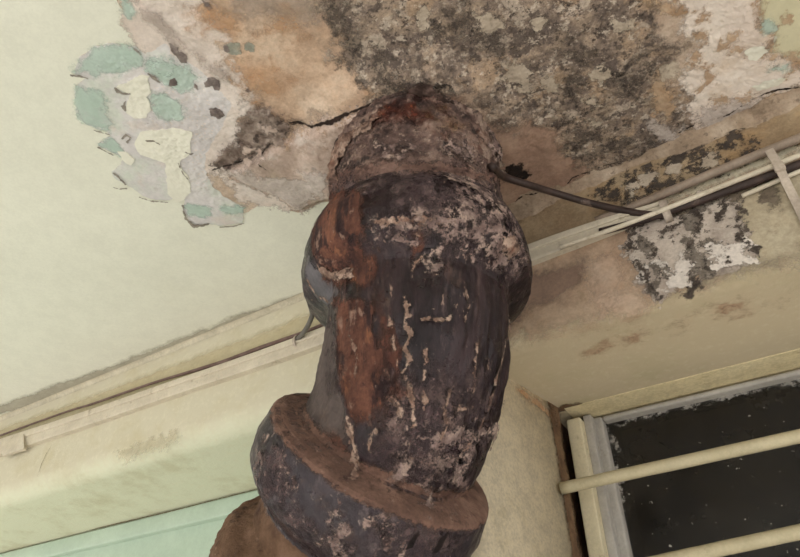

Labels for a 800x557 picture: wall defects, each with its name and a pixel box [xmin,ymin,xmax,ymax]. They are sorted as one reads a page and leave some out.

peeling [70,0,329,228]
crack [212,102,373,171]
rust [371,91,434,129]
spalling [367,59,496,124]
damp [195,0,800,341]
peeling [618,193,762,309]
rust [310,187,407,480]